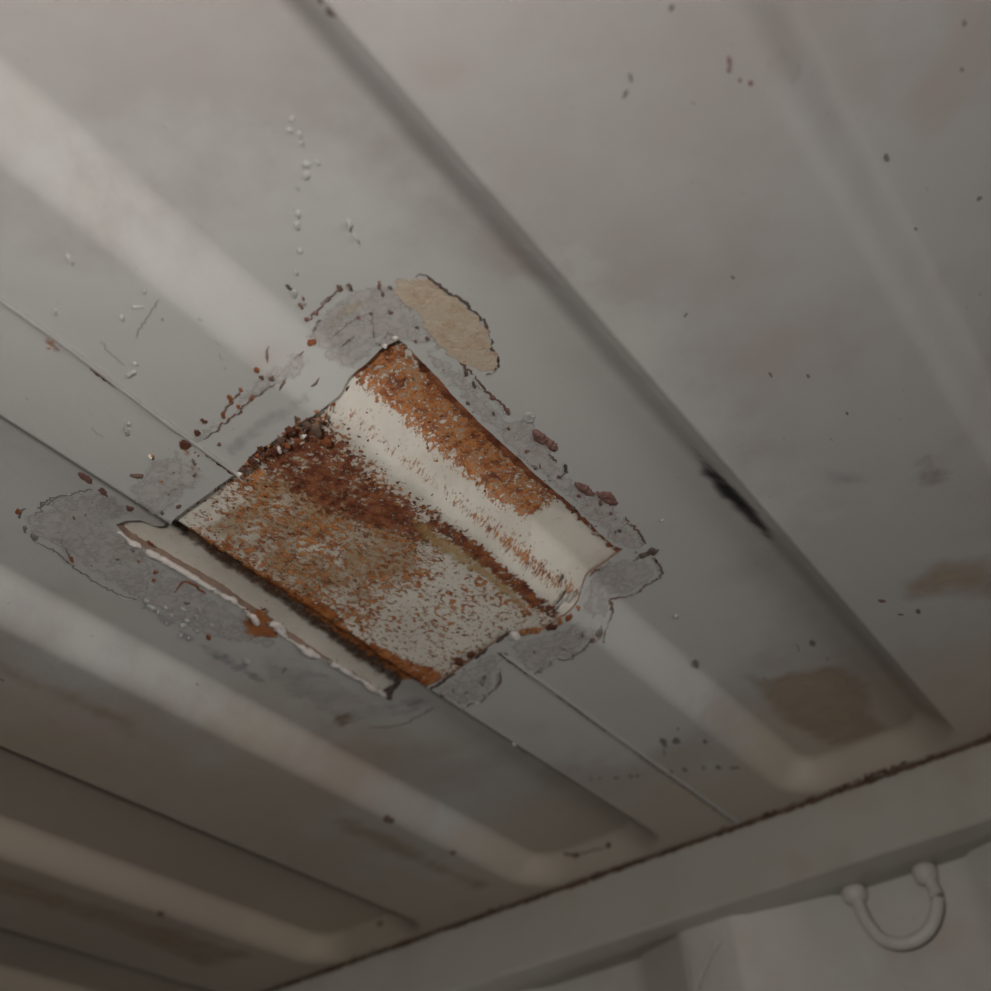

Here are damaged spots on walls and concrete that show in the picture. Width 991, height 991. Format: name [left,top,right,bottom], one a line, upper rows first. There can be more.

rust [174,340,620,690]
peeling [130,274,665,643]